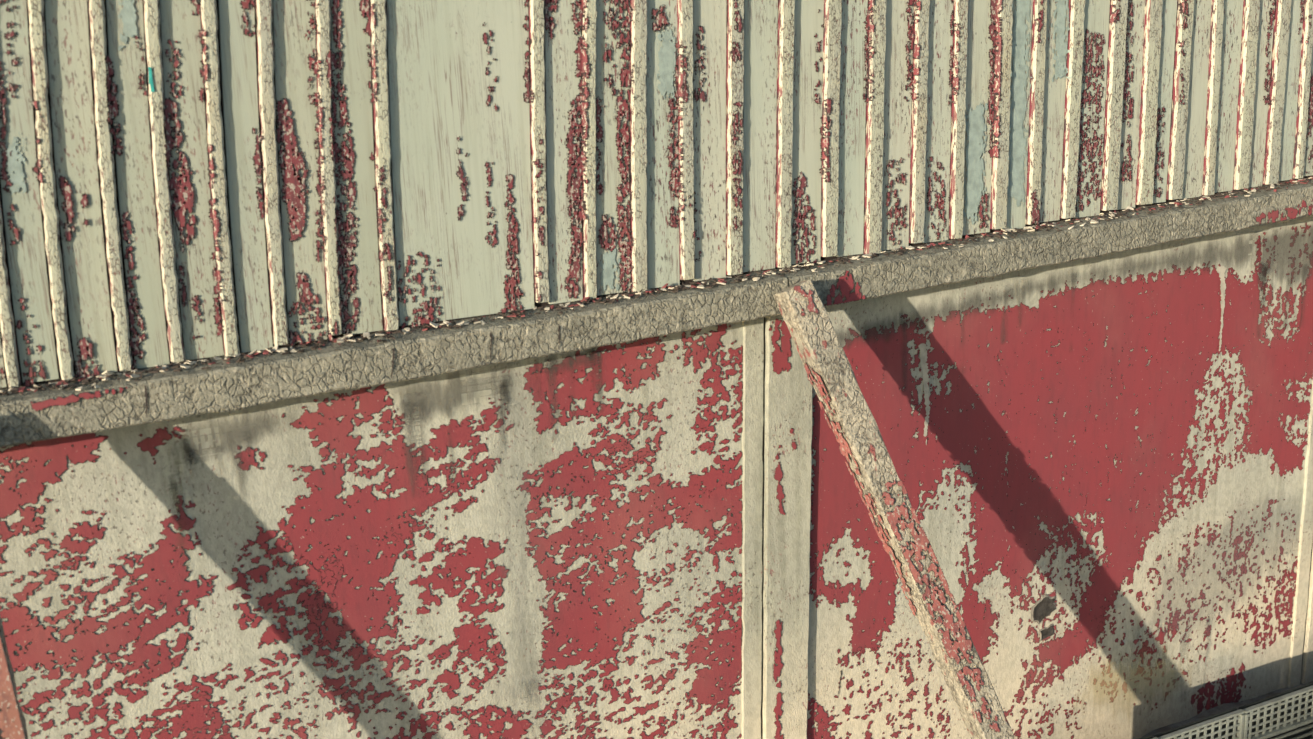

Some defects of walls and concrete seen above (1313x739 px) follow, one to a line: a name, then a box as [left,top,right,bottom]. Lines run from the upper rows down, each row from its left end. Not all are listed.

peeling [104,0,149,156]
peeling [163,39,224,340]
peeling [252,0,442,346]
peeling [484,139,545,314]
peeling [522,0,635,299]
peeling [651,4,706,262]
peeling [792,9,832,265]
peeling [904,0,922,102]
peeling [948,0,1134,229]
peeling [1153,0,1189,198]
peeling [0,324,743,739]
peeling [768,199,1313,739]